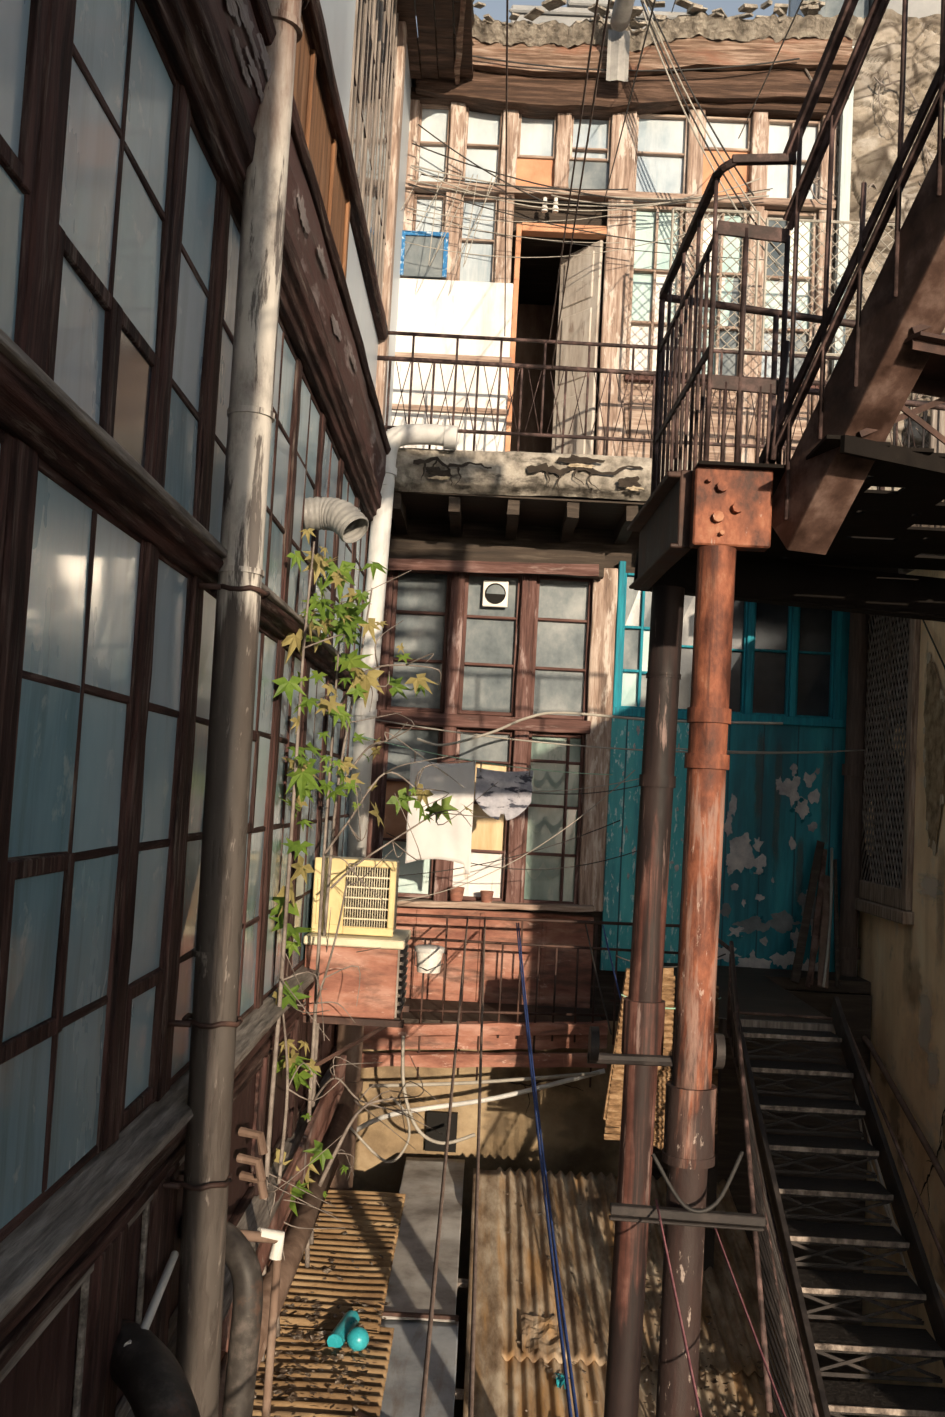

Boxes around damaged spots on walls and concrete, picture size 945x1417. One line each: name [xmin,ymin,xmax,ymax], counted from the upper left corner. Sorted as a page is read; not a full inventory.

peeling [226,0,272,105]
peeling [776,763,820,850]
peeling [718,794,818,971]